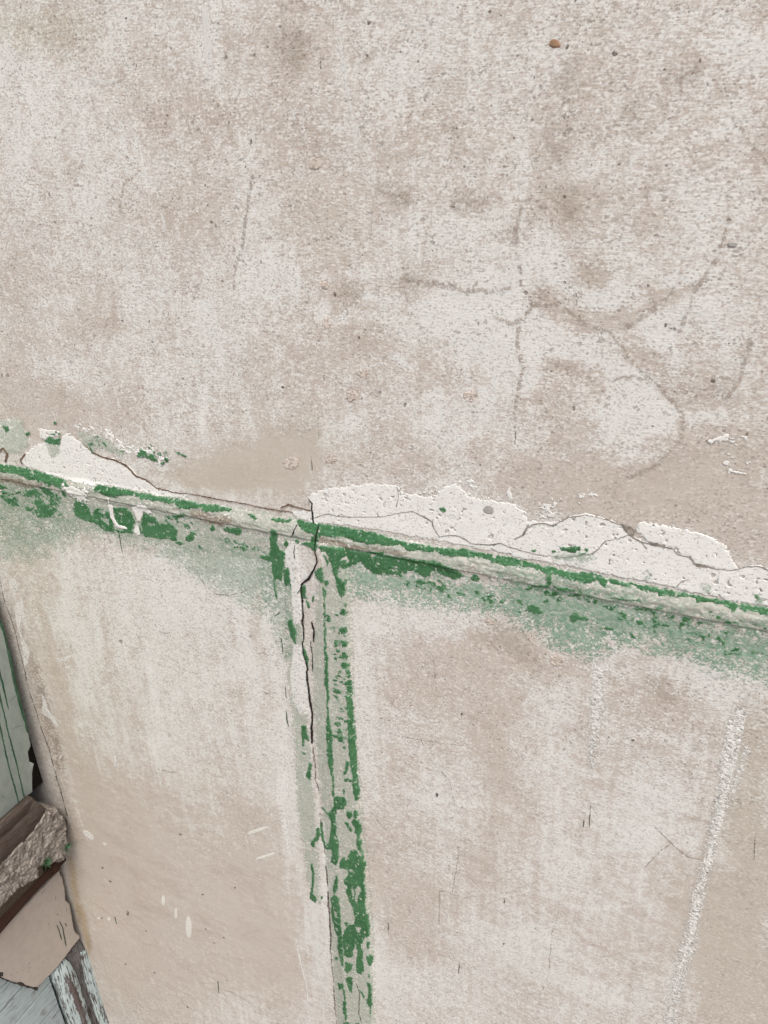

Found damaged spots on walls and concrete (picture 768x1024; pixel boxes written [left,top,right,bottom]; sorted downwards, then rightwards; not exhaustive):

crack [0,448,25,465]
peeling [0,419,768,1024]
crack [84,444,768,1024]